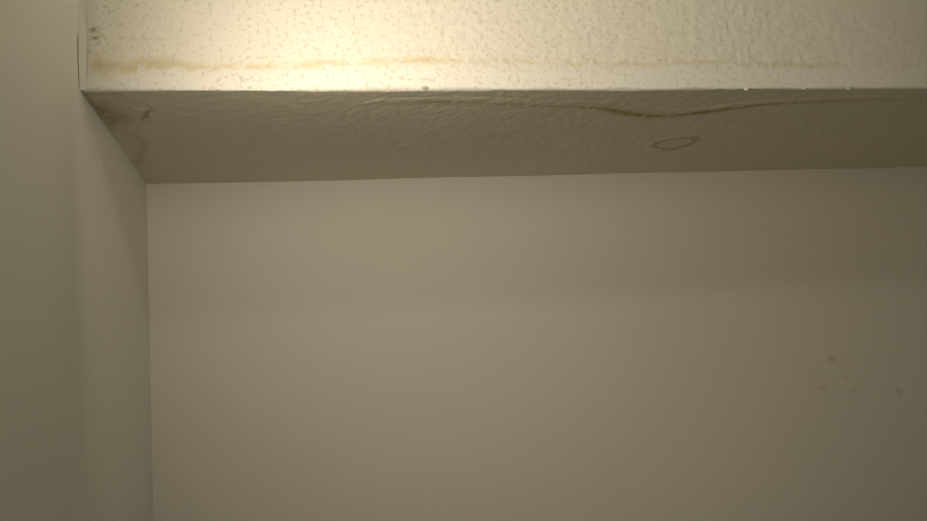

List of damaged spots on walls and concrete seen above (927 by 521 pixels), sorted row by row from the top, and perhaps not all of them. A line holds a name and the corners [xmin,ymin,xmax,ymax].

leakage [87,26,849,82]
leakage [83,93,152,170]
leakage [364,96,927,120]